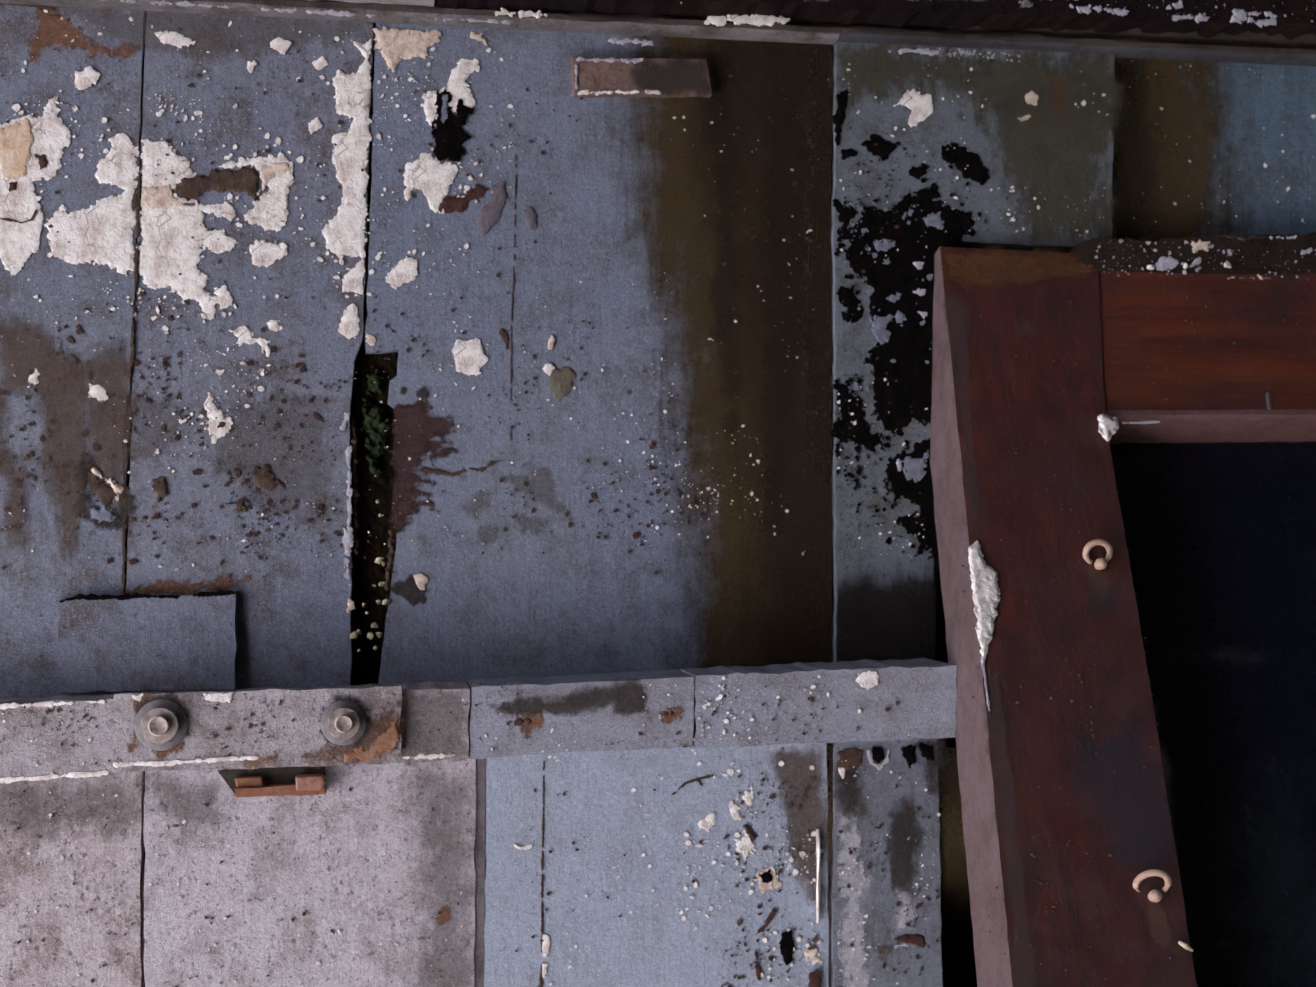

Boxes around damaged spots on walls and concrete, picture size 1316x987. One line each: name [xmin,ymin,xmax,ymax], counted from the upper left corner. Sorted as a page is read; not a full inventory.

peeling [0,96,295,319]
peeling [261,7,547,346]
peeling [704,14,791,27]
peeling [894,89,933,127]
peeling [1230,9,1277,28]
leakage [0,318,132,545]
peeling [342,446,354,579]
crack [350,156,516,685]
leakage [626,36,937,668]
peeling [829,142,990,575]
leakage [938,748,967,881]
peeling [757,909,823,987]